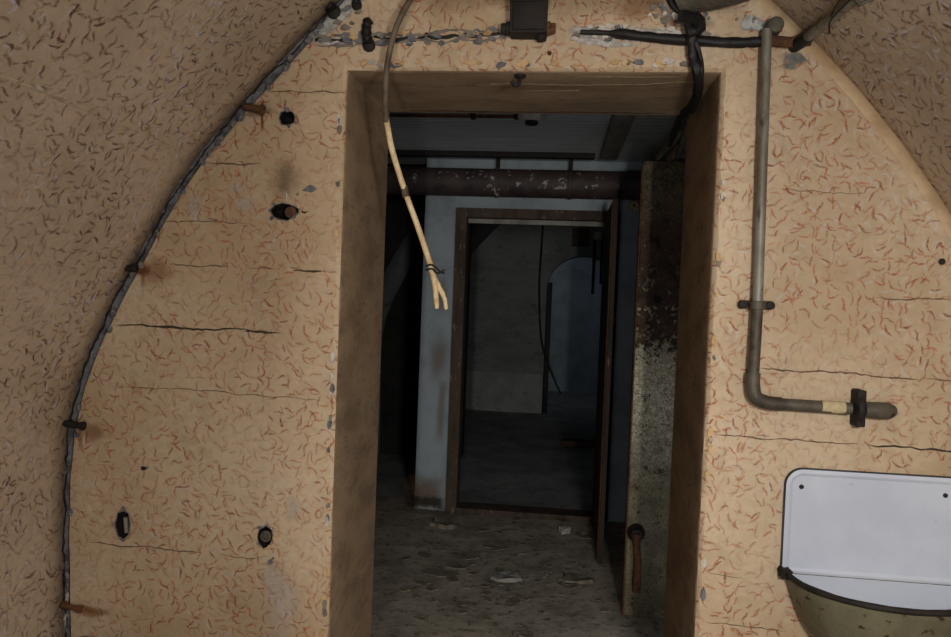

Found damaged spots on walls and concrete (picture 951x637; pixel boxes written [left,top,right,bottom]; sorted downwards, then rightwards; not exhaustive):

crack [62,0,351,637]
crack [762,368,951,381]